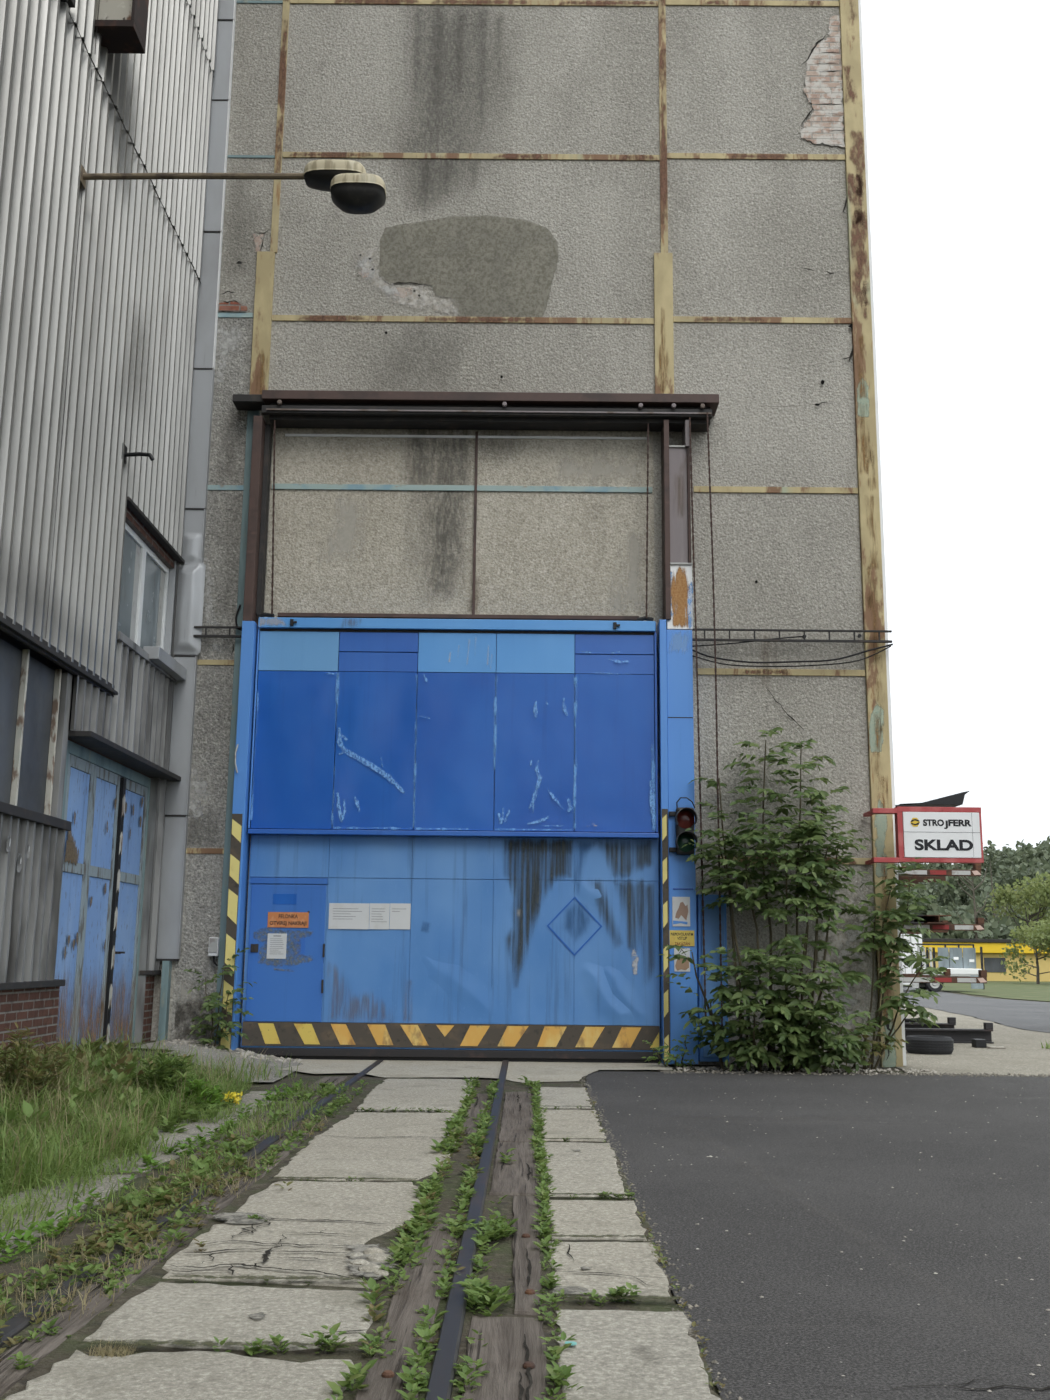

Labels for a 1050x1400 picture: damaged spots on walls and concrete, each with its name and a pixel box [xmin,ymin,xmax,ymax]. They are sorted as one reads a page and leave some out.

flaking render [800,14,845,147]
flaking render [357,250,457,313]
corrosion [848,132,868,318]
corrosion [860,420,875,540]
corrosion [671,567,689,627]
crack [89,1218,404,1293]